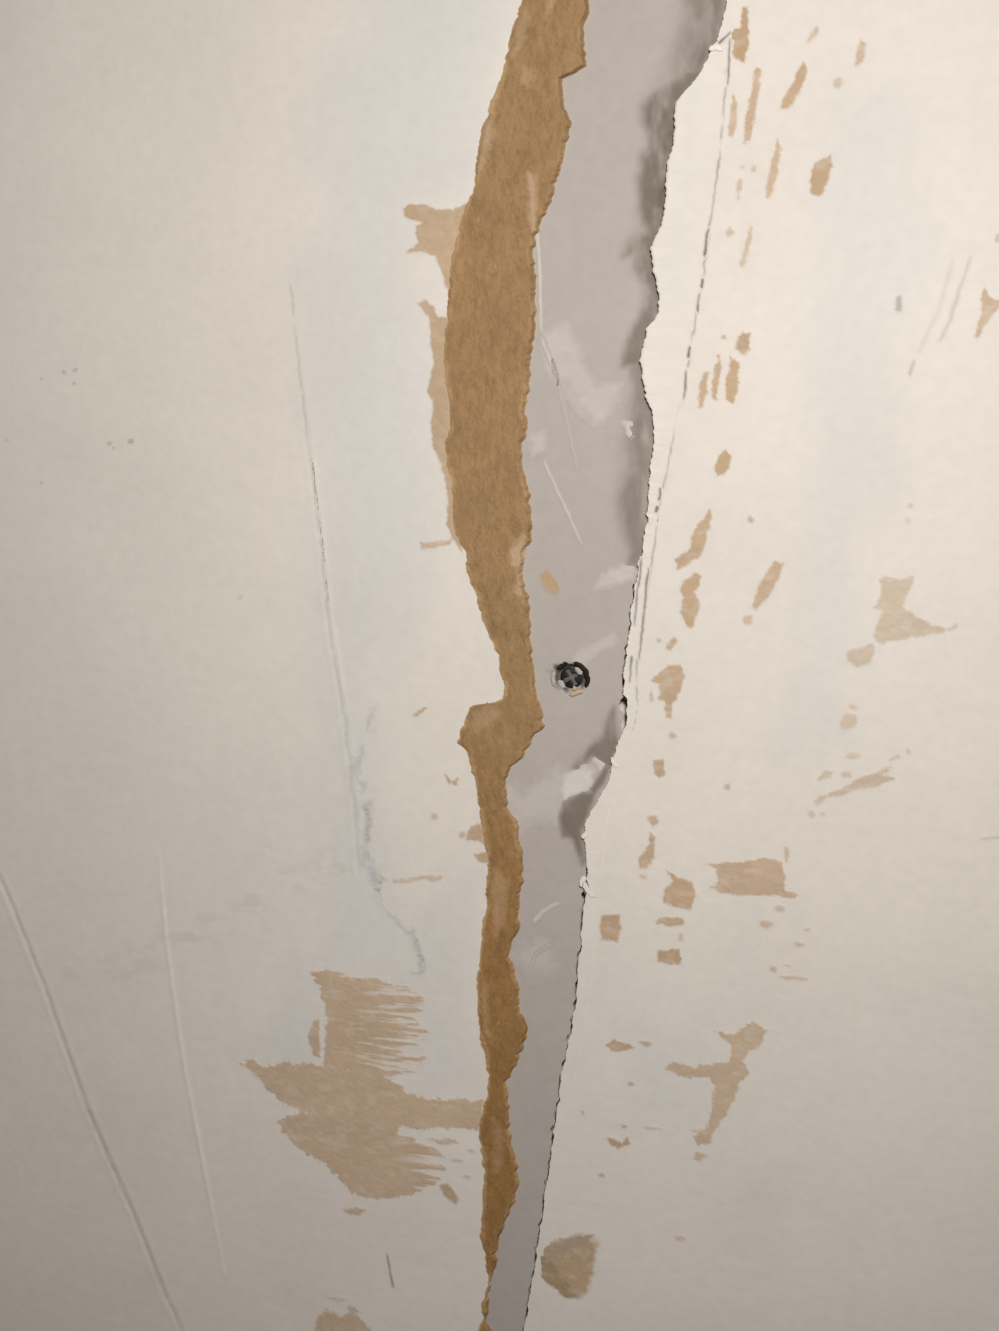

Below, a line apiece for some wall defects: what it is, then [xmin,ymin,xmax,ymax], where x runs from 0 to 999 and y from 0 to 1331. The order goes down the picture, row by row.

peeling [237,0,769,1331]
peeling [845,574,959,669]
peeling [637,813,799,967]